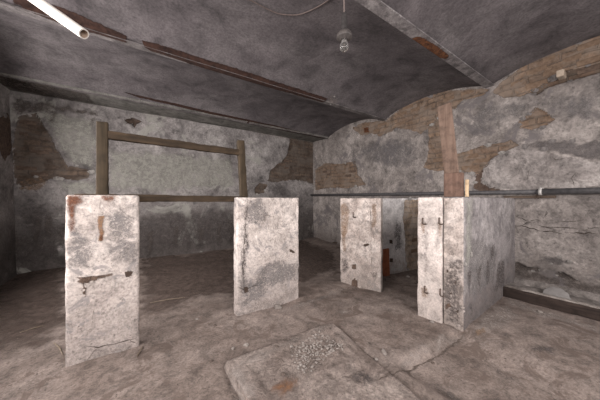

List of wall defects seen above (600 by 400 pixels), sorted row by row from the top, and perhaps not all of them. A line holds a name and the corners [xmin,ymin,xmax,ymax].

rust [412,37,449,59]
flaking render [353,36,600,171]
flaking render [0,112,96,191]
flaking render [255,137,366,196]
flaking render [457,139,600,191]
rust [67,195,80,225]
crack [501,209,598,234]
spalling [78,274,112,295]